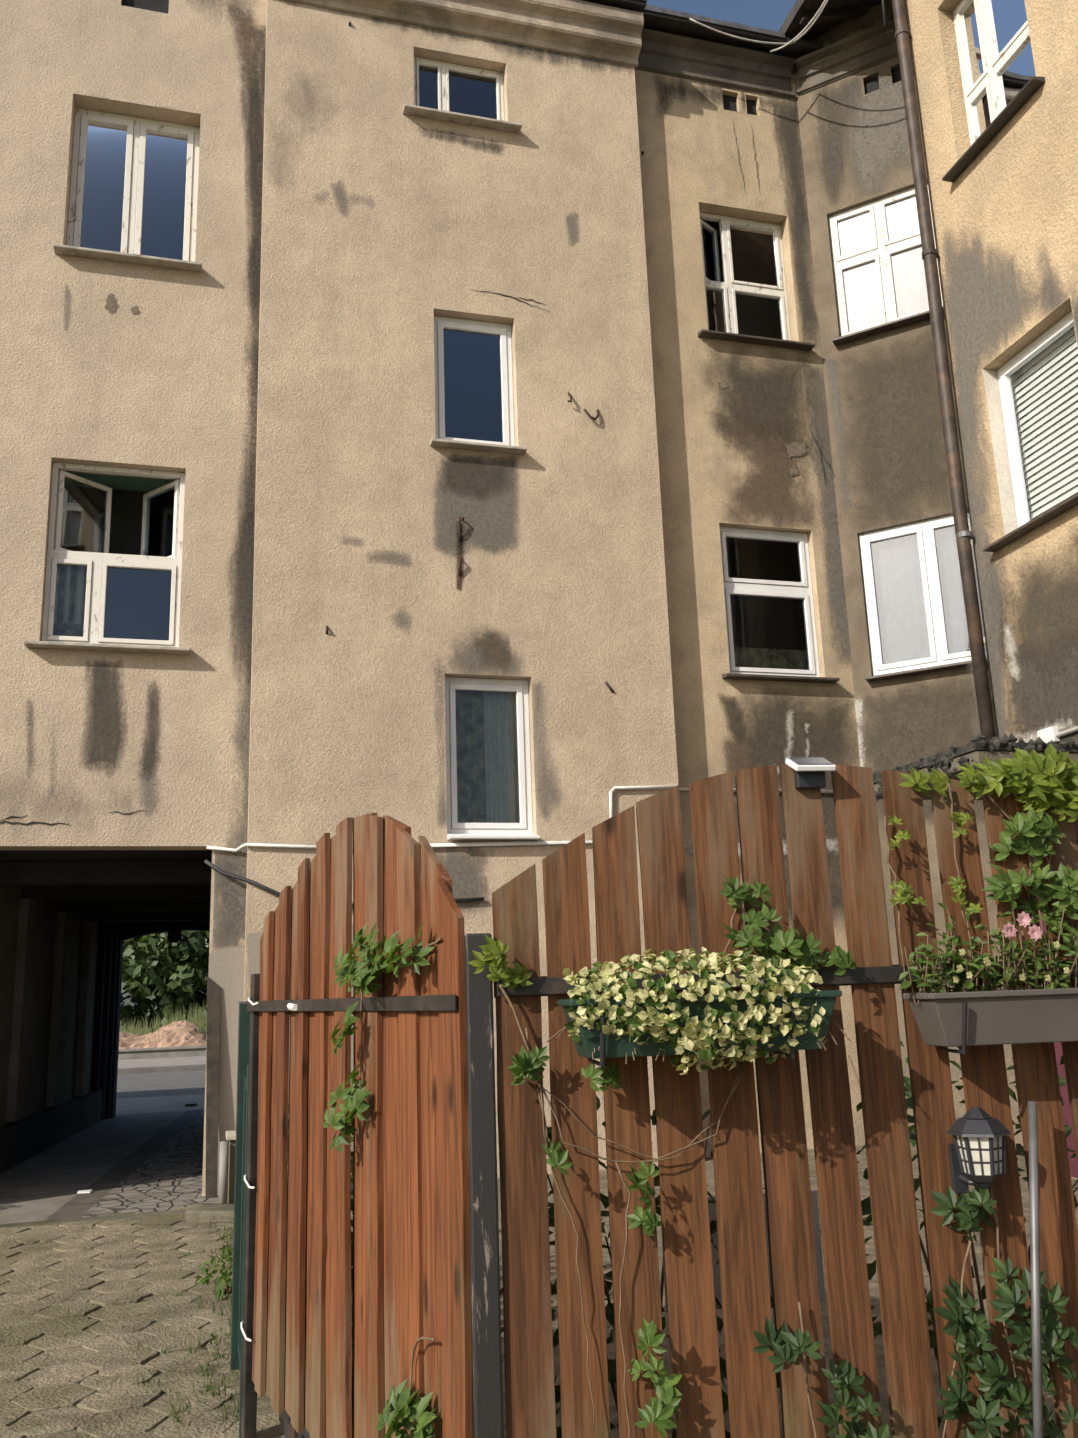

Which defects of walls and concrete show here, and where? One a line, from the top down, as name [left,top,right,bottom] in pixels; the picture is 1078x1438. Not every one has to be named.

crack [471,289,550,312]
leakage [213,0,266,946]
leakage [435,456,517,556]
leakage [716,239,1078,920]
leakage [455,633,516,675]
leakage [84,663,123,769]
leakage [142,687,158,808]
crack [0,815,70,825]